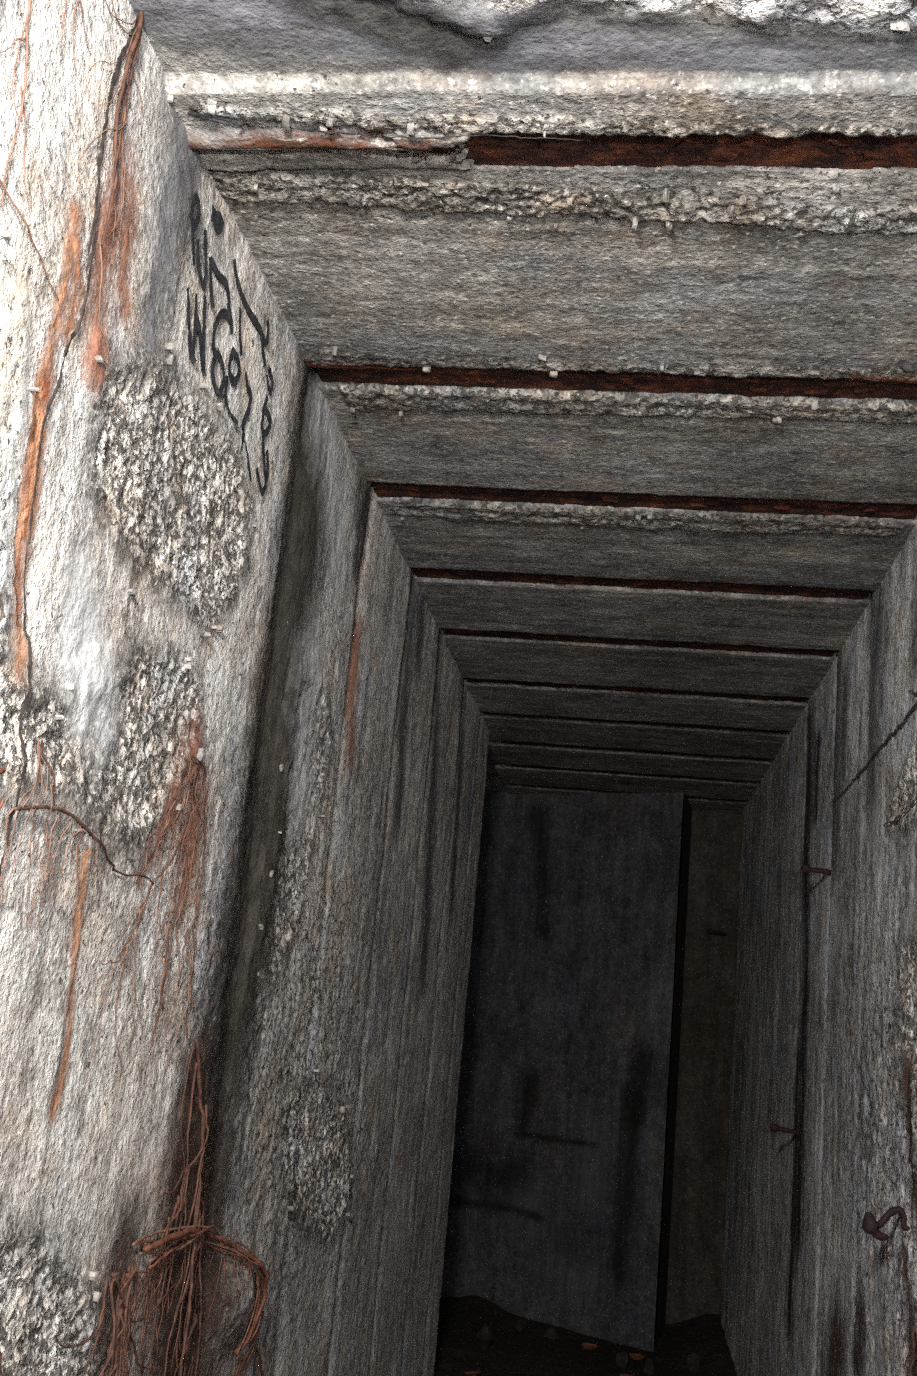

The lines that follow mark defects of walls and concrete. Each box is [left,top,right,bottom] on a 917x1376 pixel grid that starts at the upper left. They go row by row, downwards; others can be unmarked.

crack [832,690,917,806]
crack [884,797,917,826]